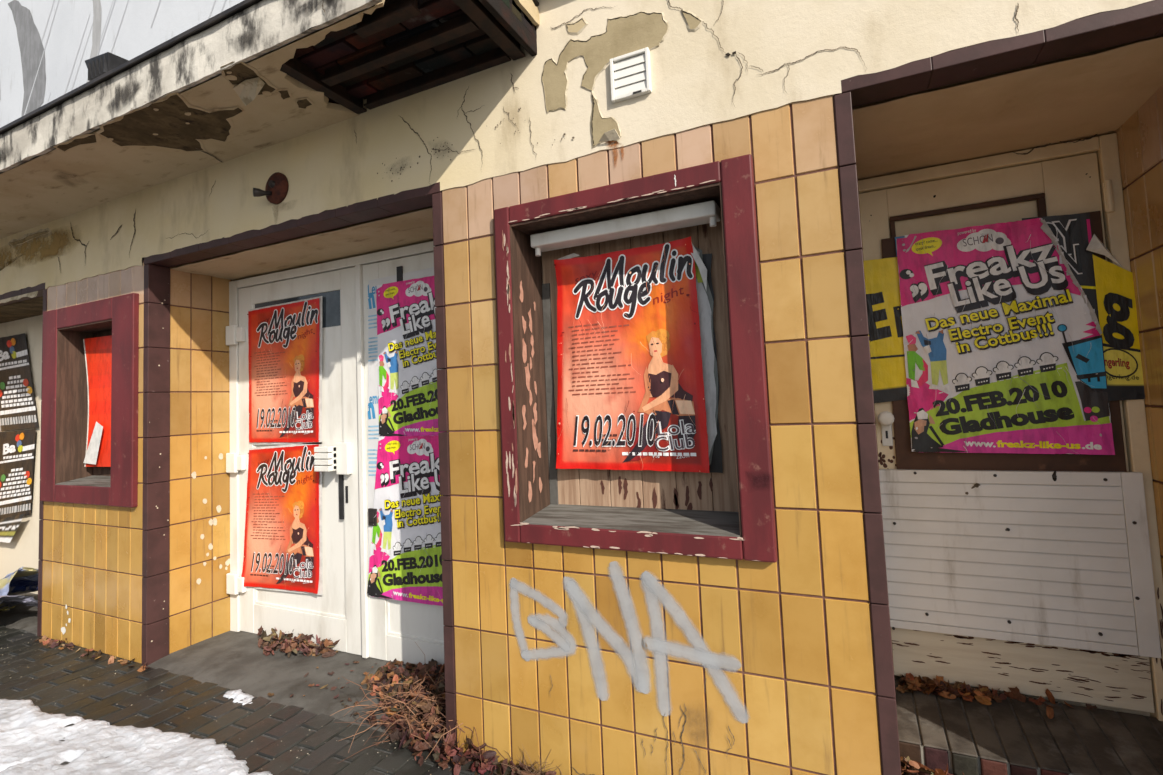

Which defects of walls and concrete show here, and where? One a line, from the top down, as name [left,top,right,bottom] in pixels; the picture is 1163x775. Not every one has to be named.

damp [108,81,139,109]
spalling [51,61,314,153]
damp [237,32,253,48]
crack [400,73,537,186]
flaking render [541,11,669,148]
flaking render [681,10,703,32]
crack [668,0,866,102]
peeling [607,180,715,203]
damp [0,231,70,270]
crack [57,210,136,272]
peeling [502,206,587,507]